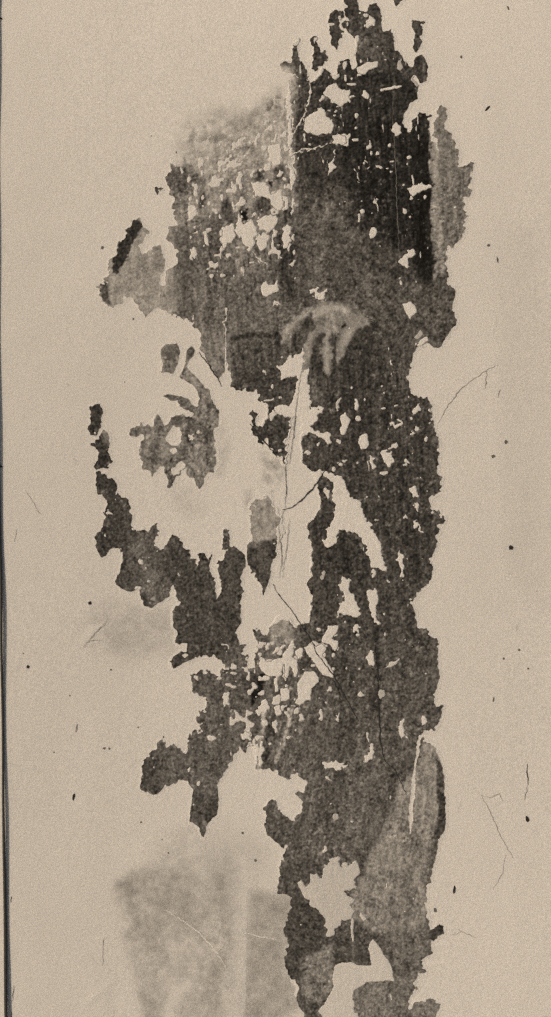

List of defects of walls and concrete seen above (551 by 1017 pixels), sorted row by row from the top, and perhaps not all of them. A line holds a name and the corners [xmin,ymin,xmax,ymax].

flaking render [85,0,476,1017]
crack [438,365,501,423]